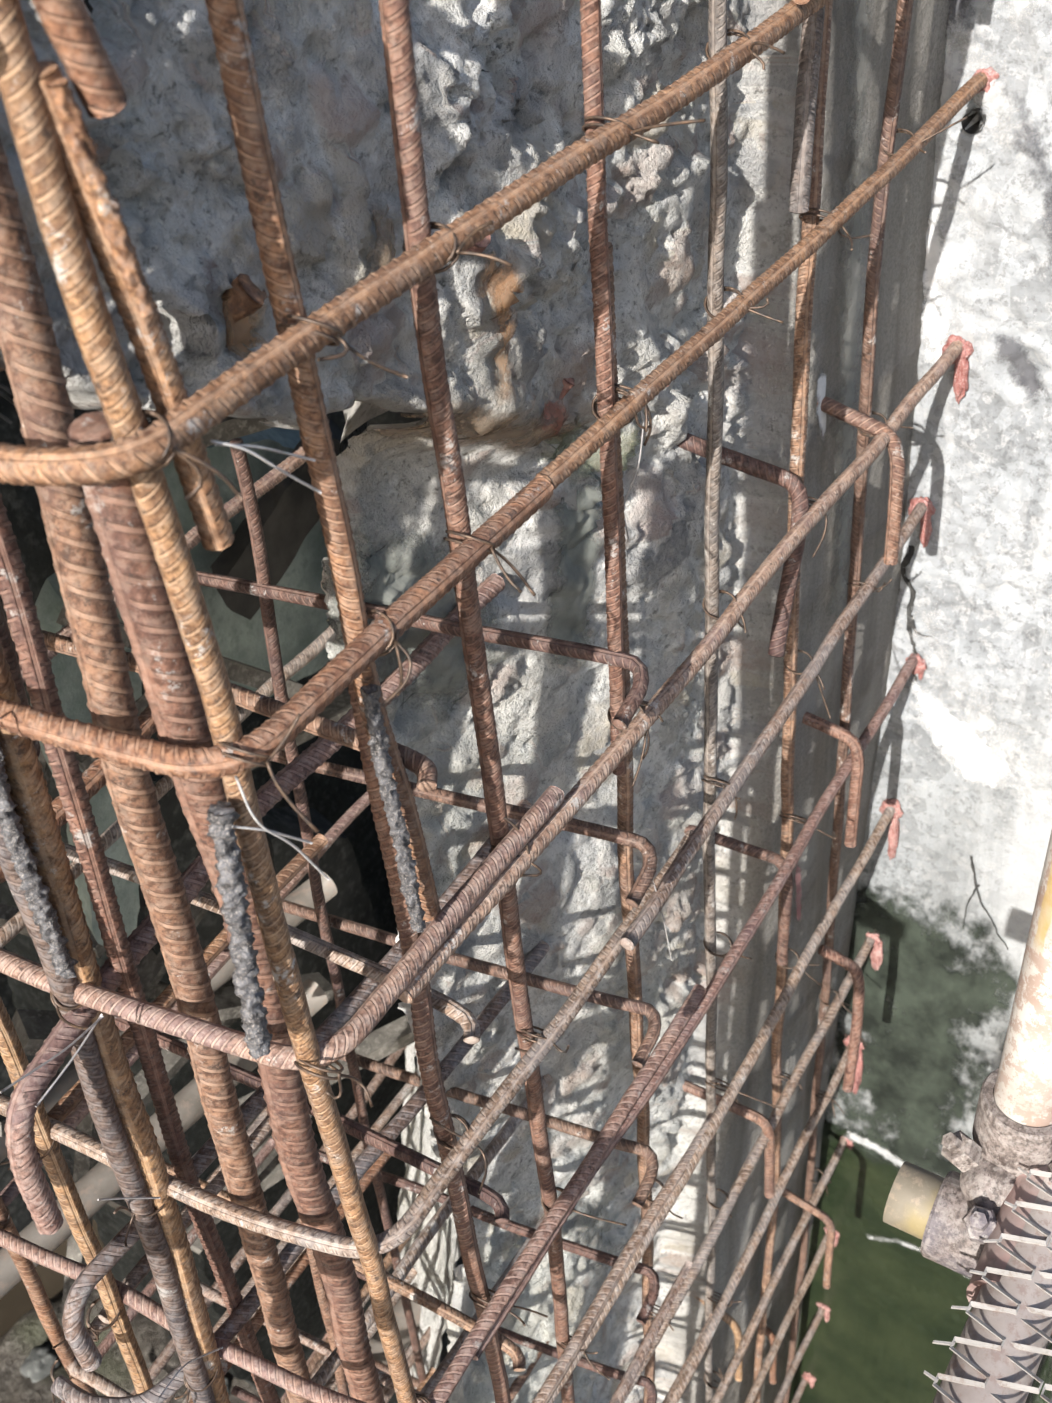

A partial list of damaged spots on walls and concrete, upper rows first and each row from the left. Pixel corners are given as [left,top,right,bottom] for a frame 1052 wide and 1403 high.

rust [482,254,522,394]
spalling [454,408,583,452]
crack [900,545,932,683]